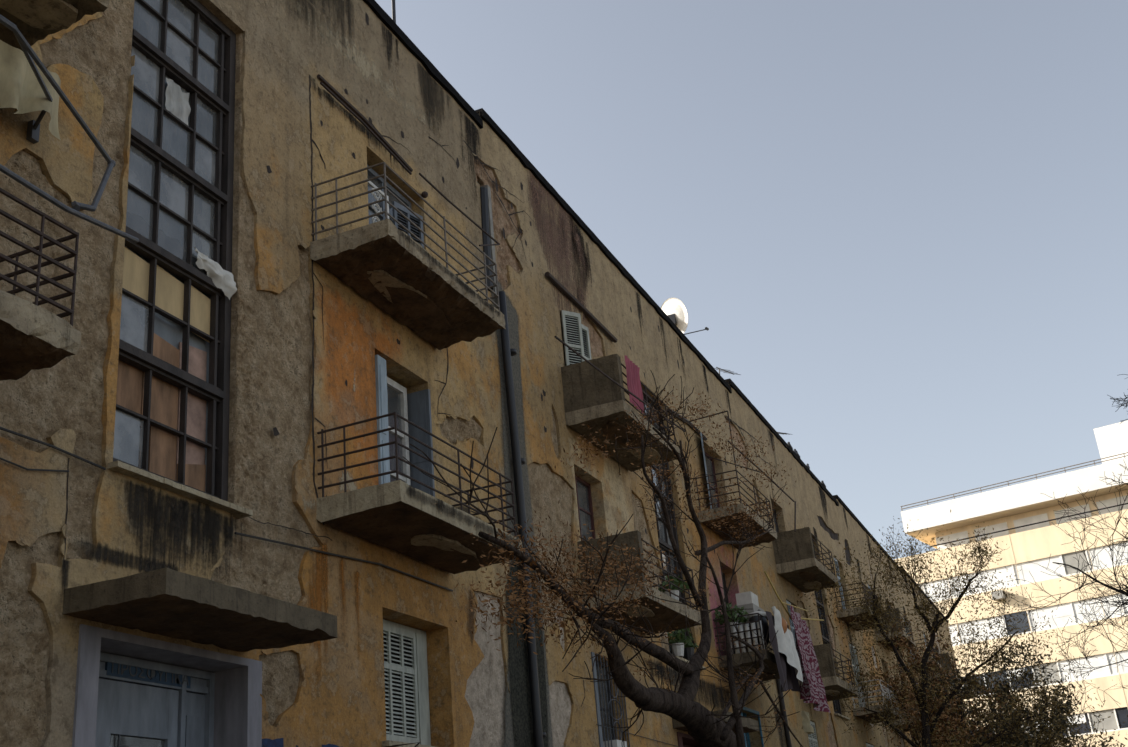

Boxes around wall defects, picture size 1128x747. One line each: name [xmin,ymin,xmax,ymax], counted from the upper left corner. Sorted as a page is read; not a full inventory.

water stain [289,0,481,187]
crack [369,120,535,258]
flaking render [0,0,135,747]
flaking render [210,98,320,606]
flaking render [436,415,482,445]
water stain [81,481,242,573]
spalling [408,534,481,571]
flaking render [527,462,574,651]
flaking render [464,592,510,747]